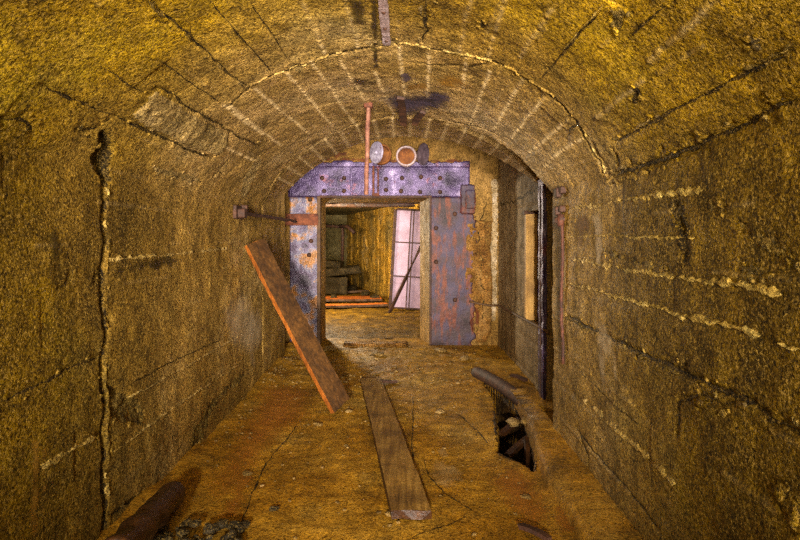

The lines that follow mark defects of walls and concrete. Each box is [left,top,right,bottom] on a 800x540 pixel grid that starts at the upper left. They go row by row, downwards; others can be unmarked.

crack [40,0,796,179]
damp [388,73,463,113]
crack [1,188,223,532]